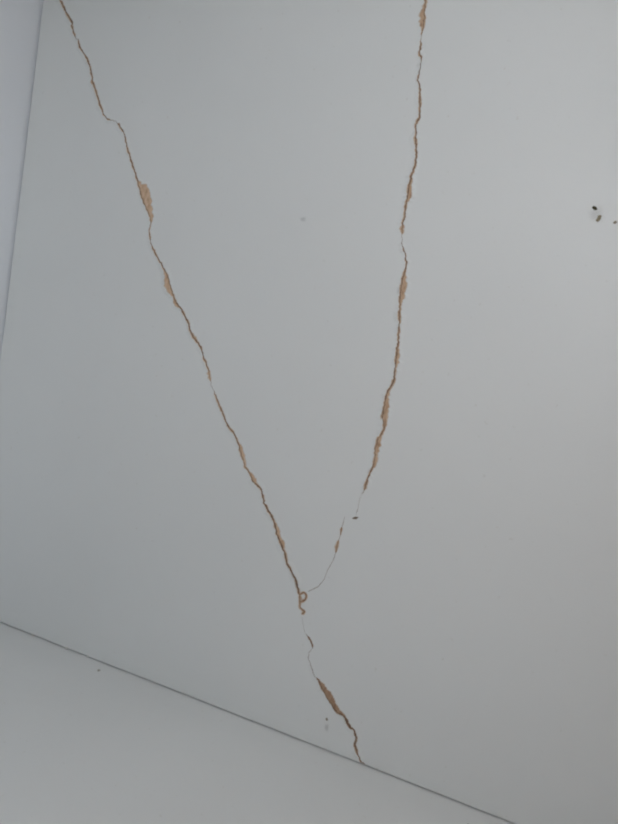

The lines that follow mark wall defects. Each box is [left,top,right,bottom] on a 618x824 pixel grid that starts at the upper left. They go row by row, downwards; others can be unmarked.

crack [54,0,432,764]